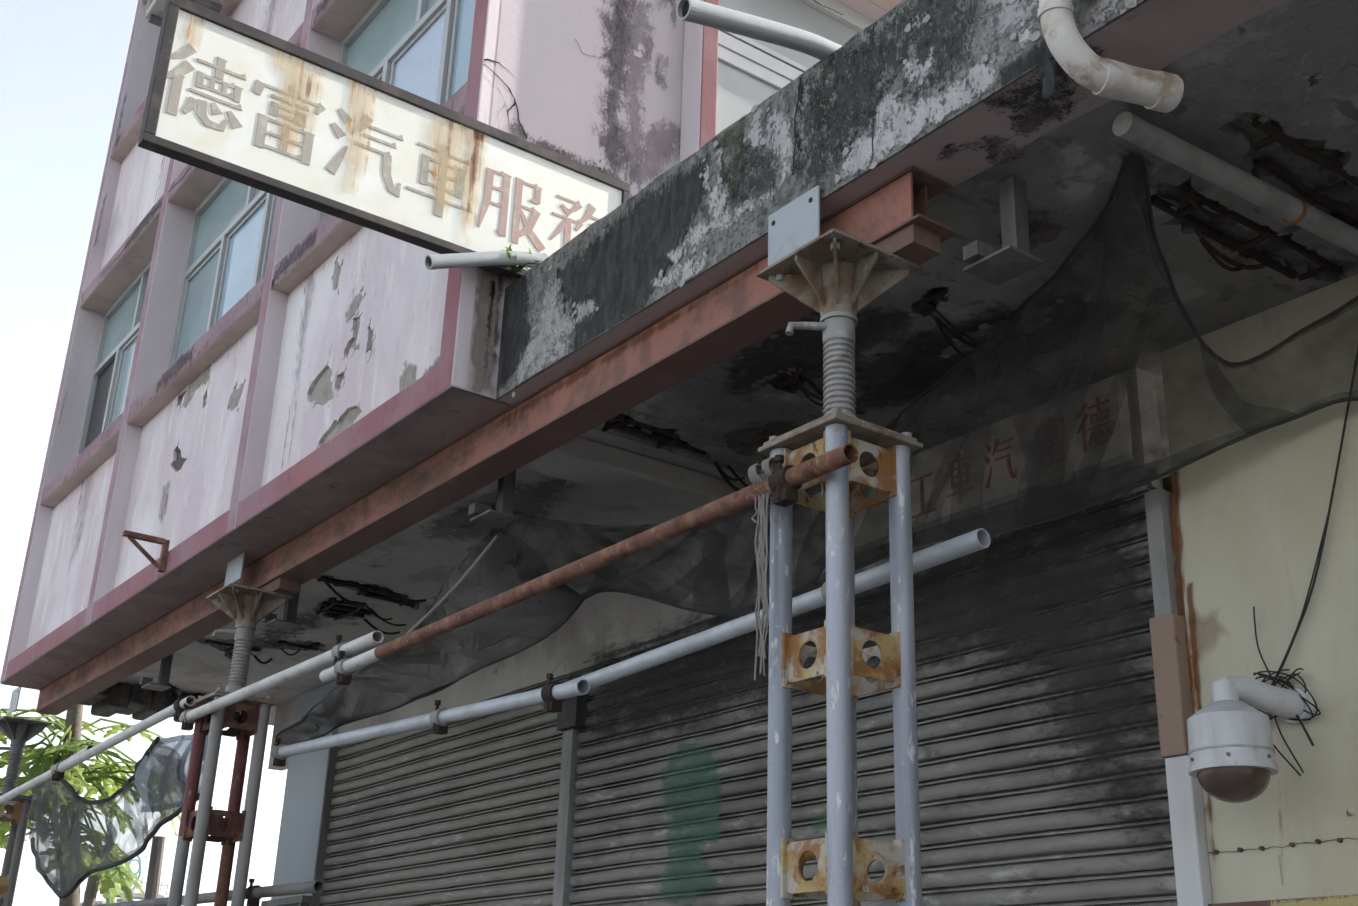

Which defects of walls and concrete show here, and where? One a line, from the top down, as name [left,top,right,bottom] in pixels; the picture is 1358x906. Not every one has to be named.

water stain [511,0,985,351]
spalling [1219,112,1358,225]
spalling [1150,173,1355,285]
peeling [330,256,343,294]
spalling [306,286,376,449]
peeling [397,352,440,393]
water stain [725,312,824,391]
spalling [602,412,800,491]
spalling [309,573,426,635]